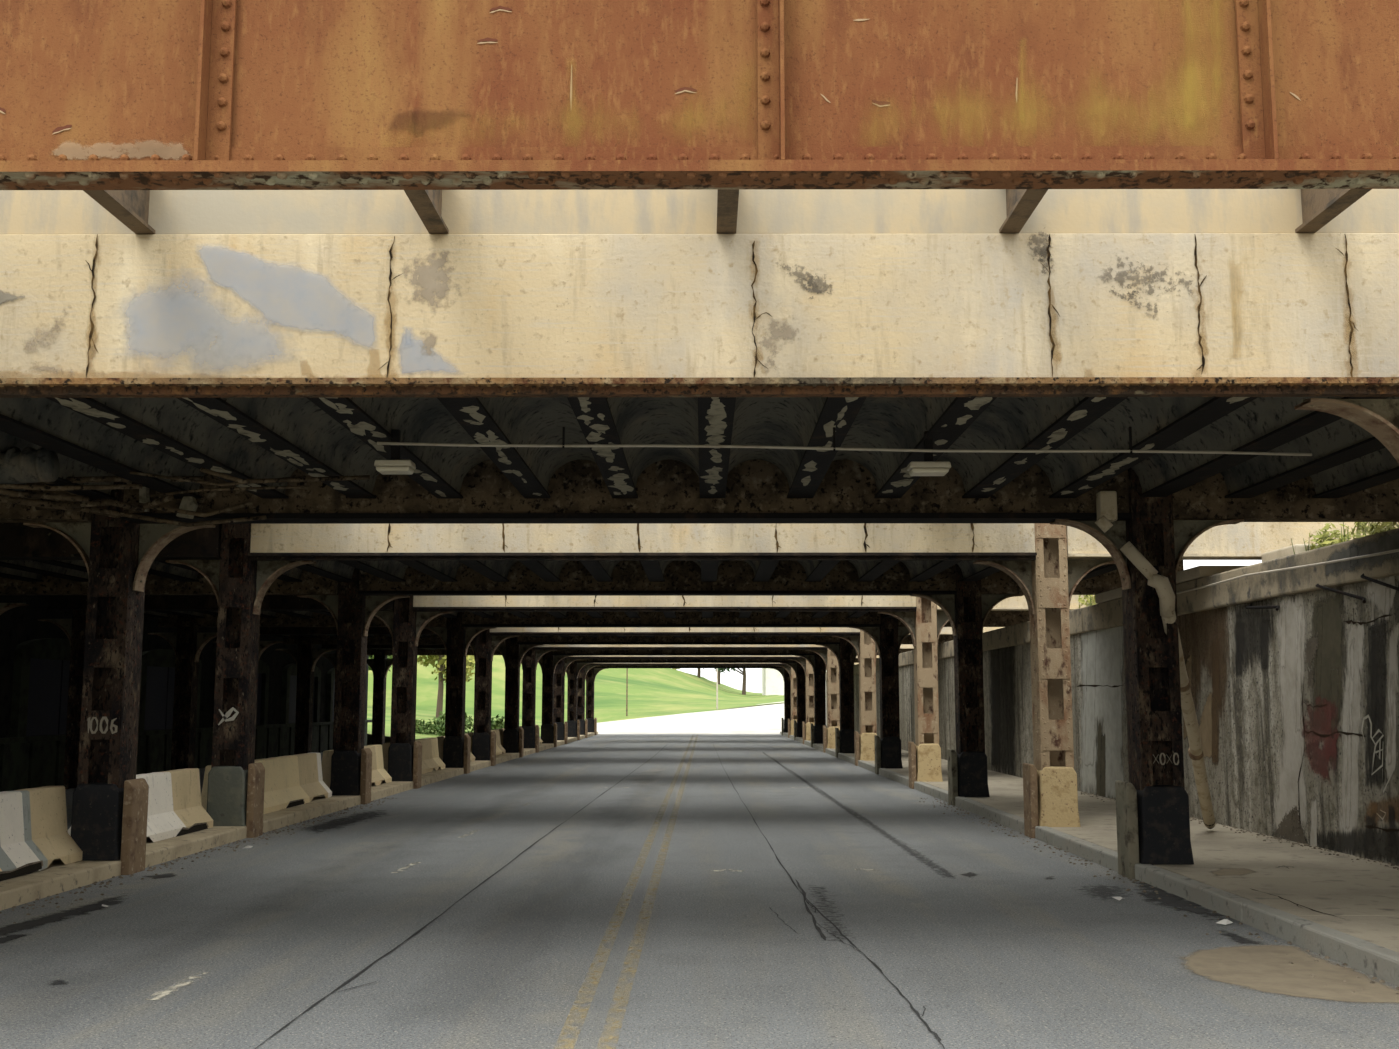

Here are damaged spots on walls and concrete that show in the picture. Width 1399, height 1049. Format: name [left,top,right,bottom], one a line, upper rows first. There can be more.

peeling [52,125,189,159]
crack [85,234,98,377]
crack [377,236,403,377]
crack [751,241,772,377]
crack [1041,234,1060,377]
crack [1194,236,1207,375]
crack [1336,235,1356,377]
peeling [184,398,348,491]
peeling [320,398,386,452]
peeling [577,397,634,495]
peeling [701,397,727,494]
leakage [1234,530,1399,865]